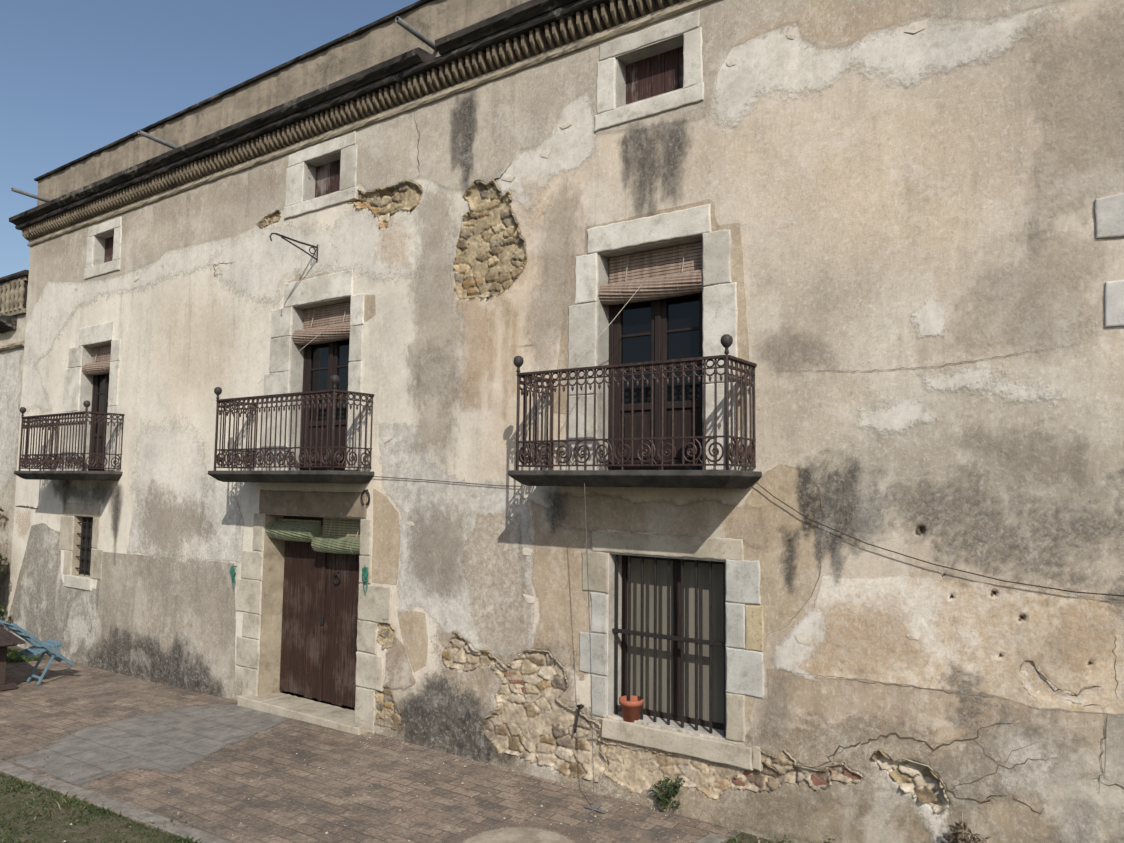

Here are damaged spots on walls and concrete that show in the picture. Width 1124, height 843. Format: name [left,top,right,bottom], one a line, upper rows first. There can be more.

water stain [451,94,474,189]
water stain [622,123,686,216]
spalling [0,93,597,497]
water stain [408,192,470,462]
water stain [784,448,1124,612]
water stain [87,628,223,697]
flaking render [354,422,988,843]
crack [797,696,1056,814]
crack [1020,621,1124,790]